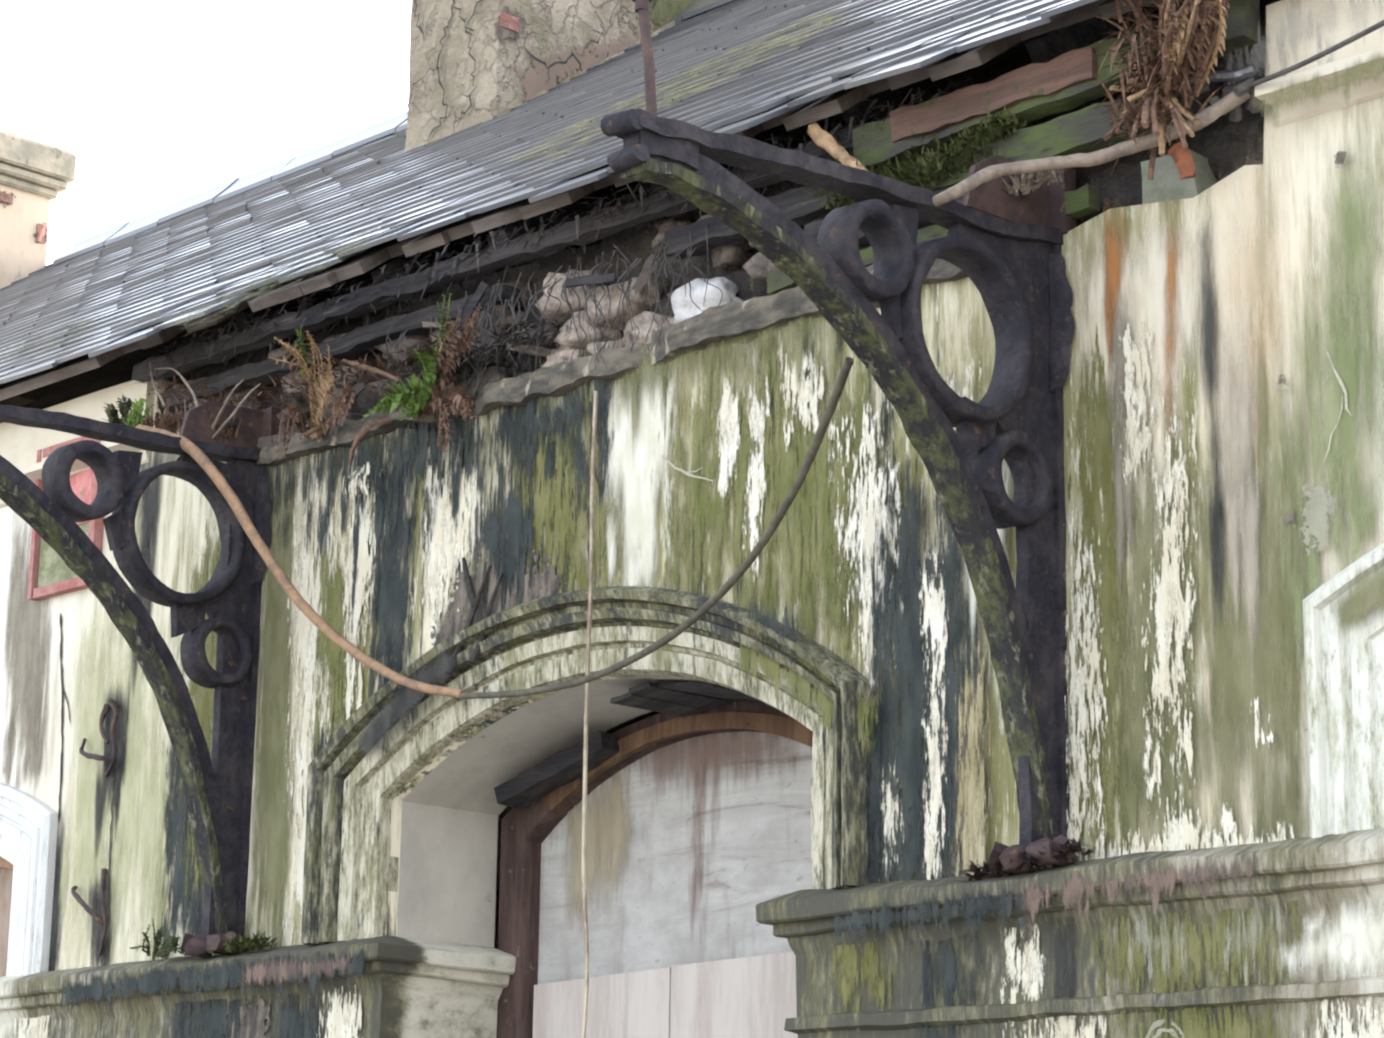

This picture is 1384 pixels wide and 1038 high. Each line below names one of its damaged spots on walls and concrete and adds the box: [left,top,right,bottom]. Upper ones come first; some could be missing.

crack [405,0,482,141]
crack [524,35,605,85]
damp [3,526,50,785]
flaking render [34,223,48,244]
peeling [283,450,378,946]
damp [264,314,835,759]
peeling [603,371,676,586]
damp [653,441,1260,1038]
rust [1104,225,1123,355]
damp [1078,224,1258,639]
rust [1166,242,1175,371]
peeling [1064,322,1294,861]